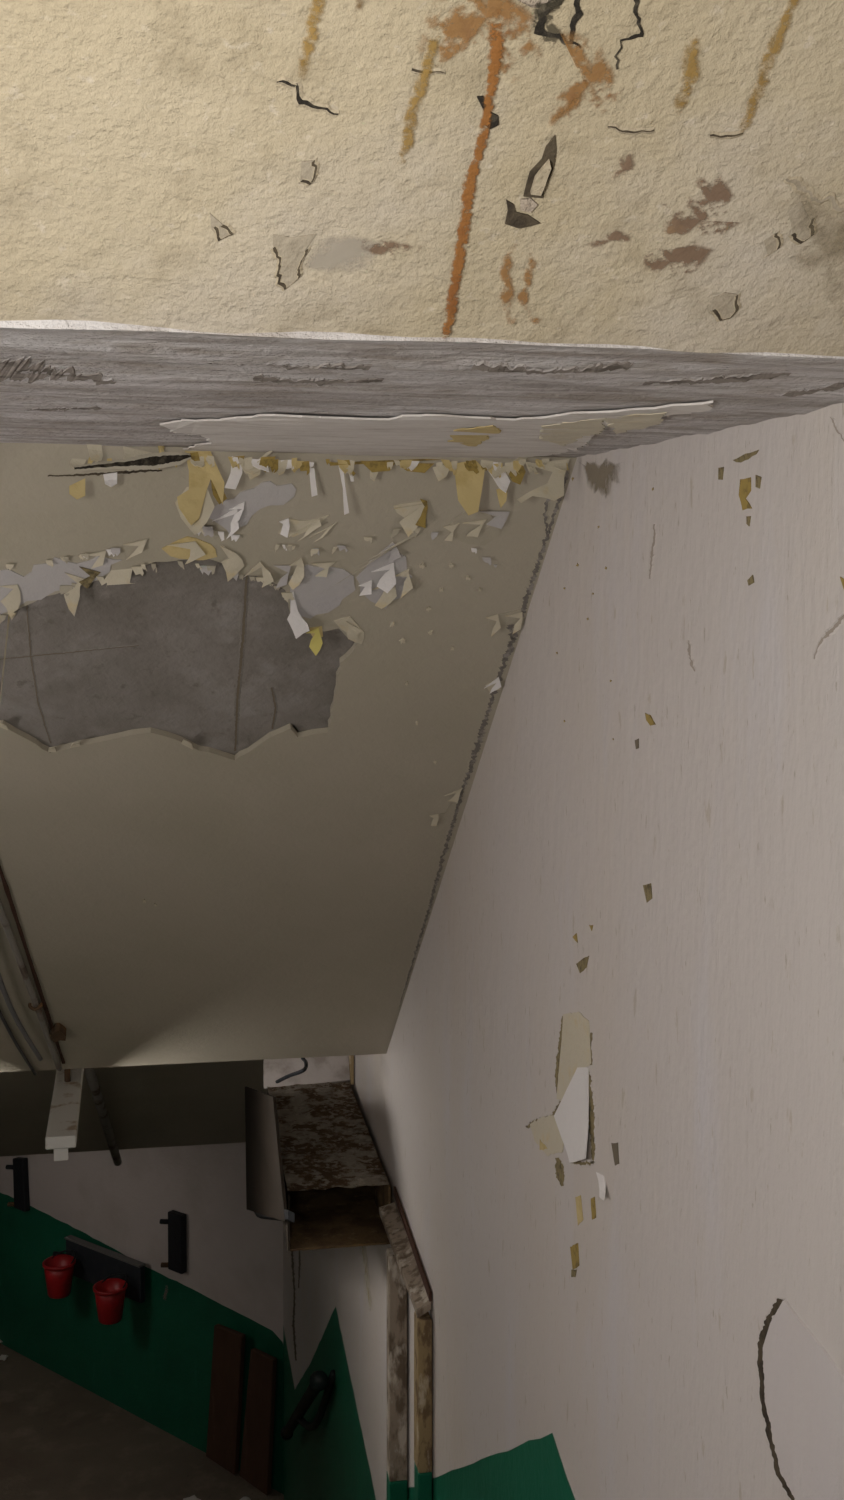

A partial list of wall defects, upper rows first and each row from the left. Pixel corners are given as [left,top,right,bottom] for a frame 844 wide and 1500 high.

corrosion [300,0,323,70]
crack [533,0,644,70]
corrosion [401,0,538,338]
spalling [505,135,556,229]
crack [471,360,844,442]
spalling [0,400,713,755]
crack [648,524,657,579]
crack [687,640,697,672]
peeling [525,1012,619,1225]
peeling [570,1243,579,1277]